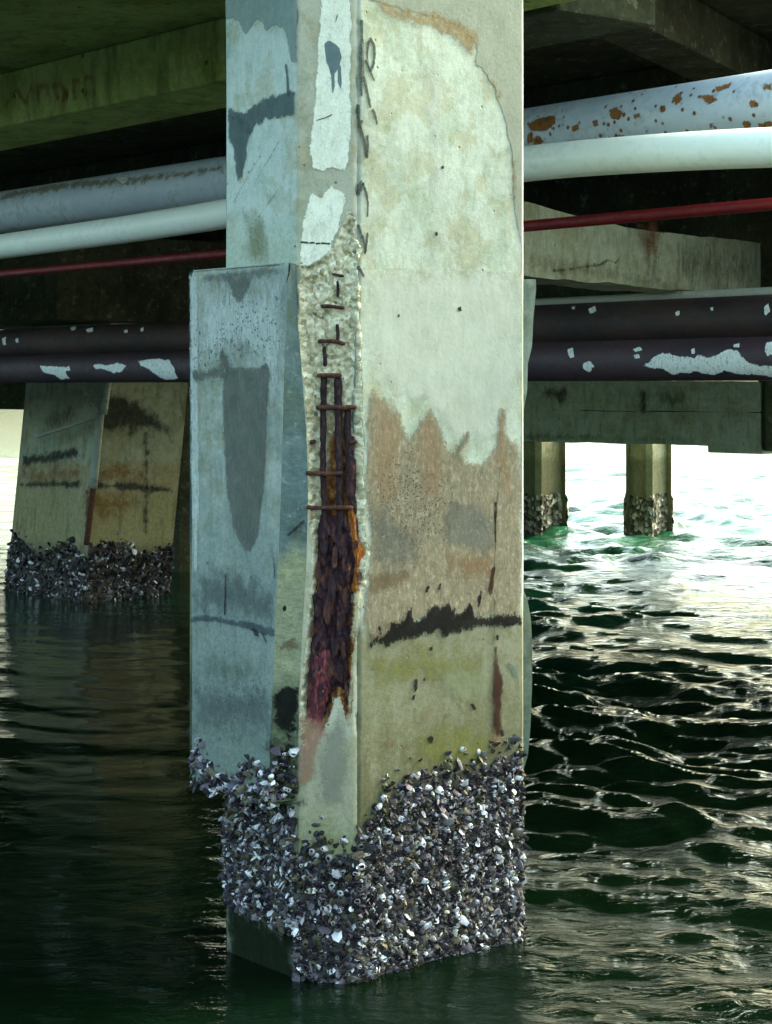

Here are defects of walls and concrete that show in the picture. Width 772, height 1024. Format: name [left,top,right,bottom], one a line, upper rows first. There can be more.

water stain [228,64,294,180]
peeling [309,0,353,171]
peeling [372,0,522,243]
rust [527,115,580,145]
rust [646,83,735,133]
rust [710,84,772,129]
water stain [99,391,172,443]
water stain [187,269,283,551]
spalling [273,186,371,803]
water stain [362,275,522,643]
peeling [633,341,772,377]
rust [493,647,503,740]